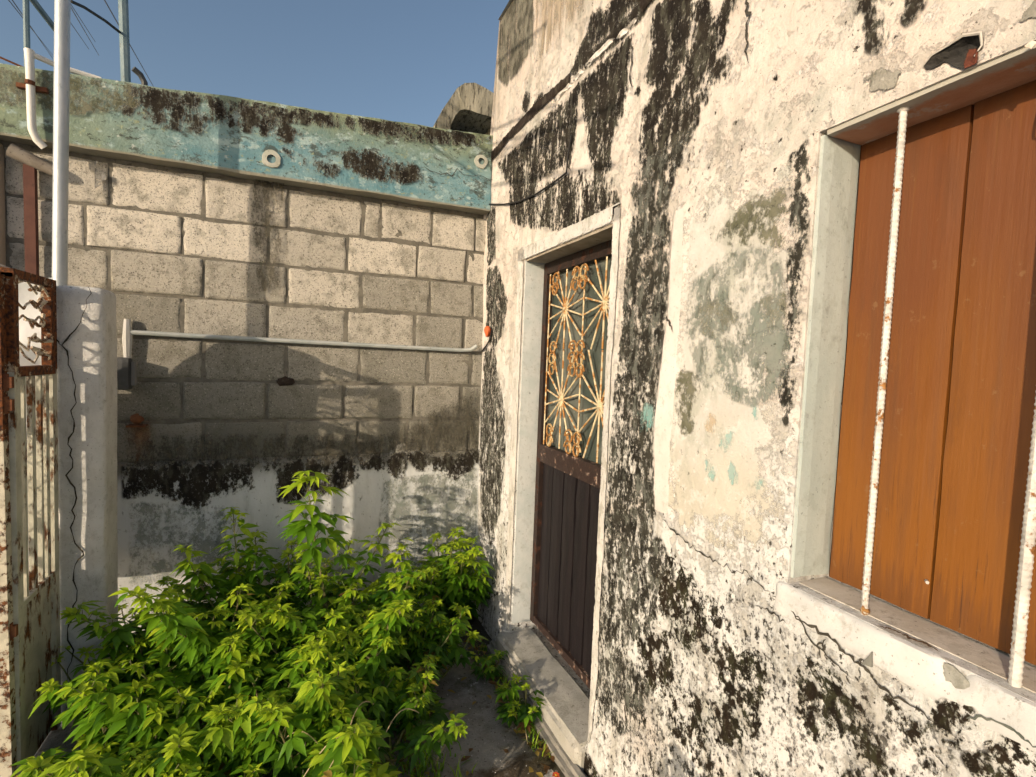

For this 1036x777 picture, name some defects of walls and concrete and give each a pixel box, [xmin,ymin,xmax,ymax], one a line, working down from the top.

water stain [122,84,491,184]
spalling [921,31,983,69]
peeling [1019,0,1036,22]
water stain [497,0,1036,777]
crack [56,286,92,681]
water stain [121,395,480,582]
crack [663,519,940,723]
crack [966,714,1036,748]